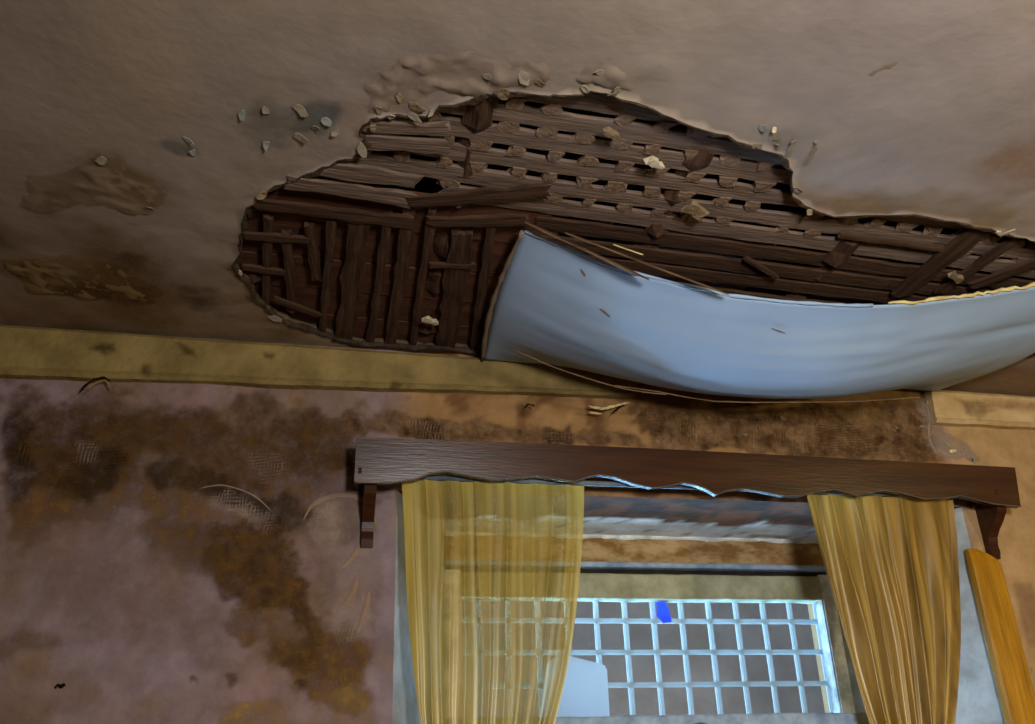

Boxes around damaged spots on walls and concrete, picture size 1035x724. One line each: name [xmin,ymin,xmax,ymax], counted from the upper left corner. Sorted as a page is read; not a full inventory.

peeling [231,51,1035,355]
water stain [3,387,642,724]